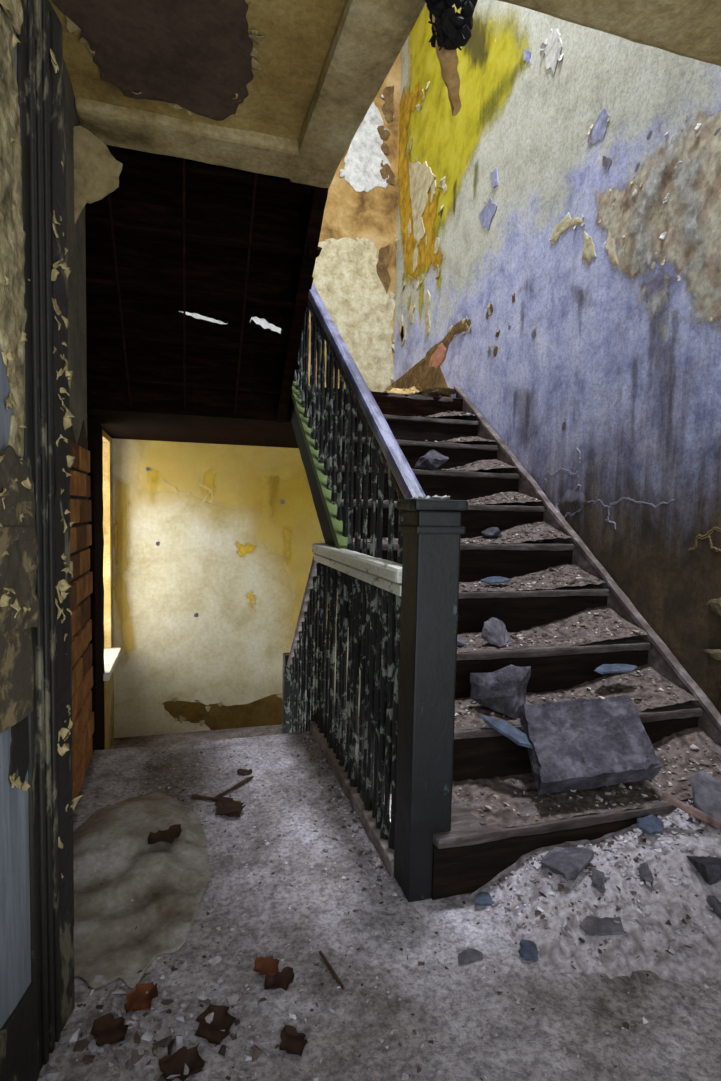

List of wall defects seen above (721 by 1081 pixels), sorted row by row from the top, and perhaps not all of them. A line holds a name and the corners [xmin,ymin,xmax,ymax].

peeling [0,0,40,633]
peeling [312,15,471,398]
peeling [479,167,499,231]
spalling [488,322,511,357]
spalling [549,108,721,341]
spalling [50,0,282,935]
crack [544,447,675,529]
crack [688,526,721,552]